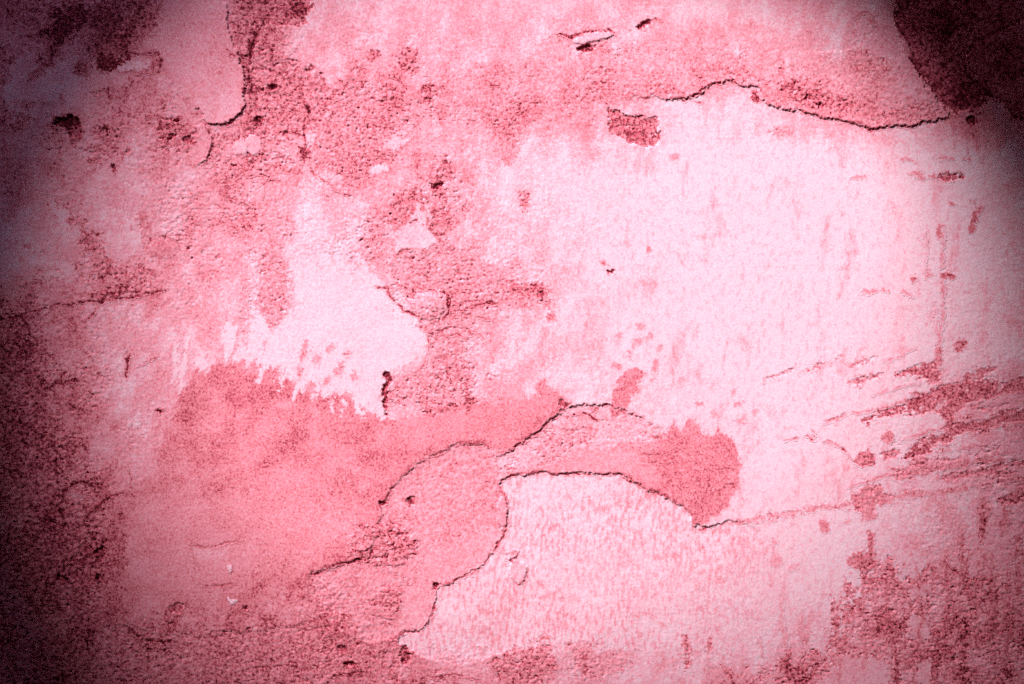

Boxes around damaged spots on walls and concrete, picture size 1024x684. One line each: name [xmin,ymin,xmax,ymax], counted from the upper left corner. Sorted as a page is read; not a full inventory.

crack [202,31,351,208]
crack [557,27,618,54]
crack [665,15,1024,135]
spalling [965,110,987,126]
peeling [0,151,1024,684]
crack [717,466,739,489]
crack [305,397,715,684]